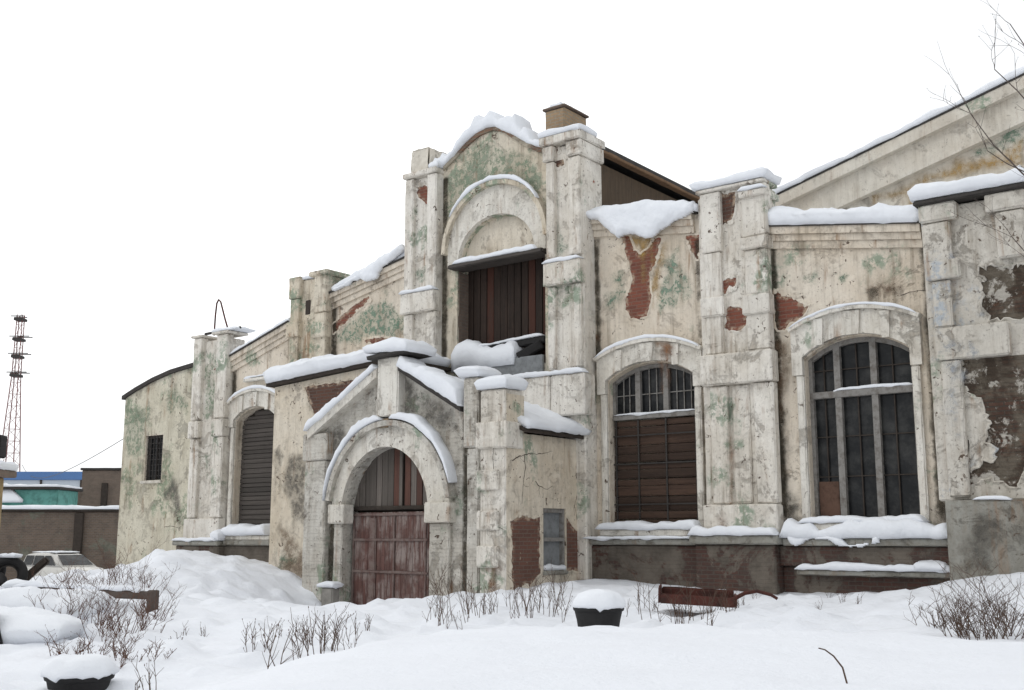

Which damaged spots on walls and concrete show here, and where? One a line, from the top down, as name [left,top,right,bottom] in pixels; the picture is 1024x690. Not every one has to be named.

spalling [416,183,428,207]
spalling [721,189,739,229]
spalling [331,294,404,346]
spalling [607,235,688,323]
spalling [723,275,747,335]
spalling [772,288,814,334]
spalling [974,261,1024,323]
spalling [302,376,358,416]
spalling [951,355,1024,490]
crack [493,448,549,496]
spalling [508,511,543,590]
spalling [567,517,578,575]